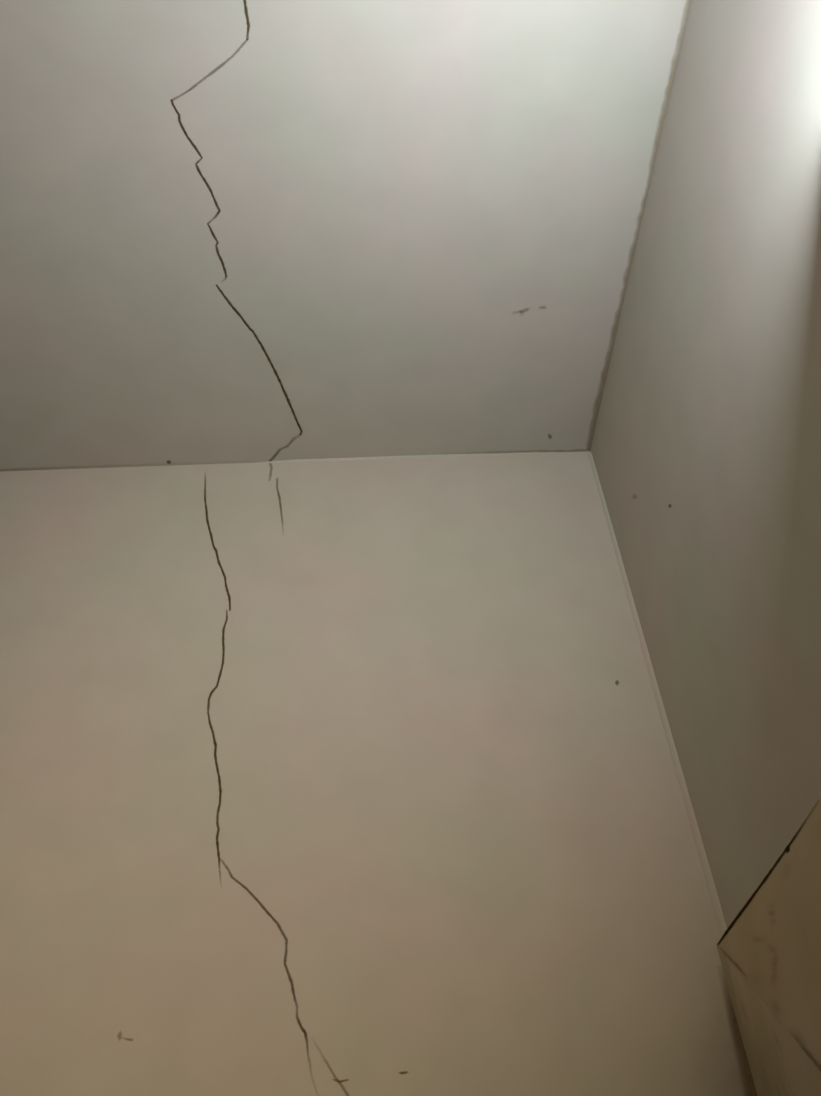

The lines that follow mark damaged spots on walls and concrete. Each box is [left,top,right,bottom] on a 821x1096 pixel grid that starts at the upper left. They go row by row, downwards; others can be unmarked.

crack [242,0,250,40]
crack [171,100,302,435]
crack [204,484,307,1040]